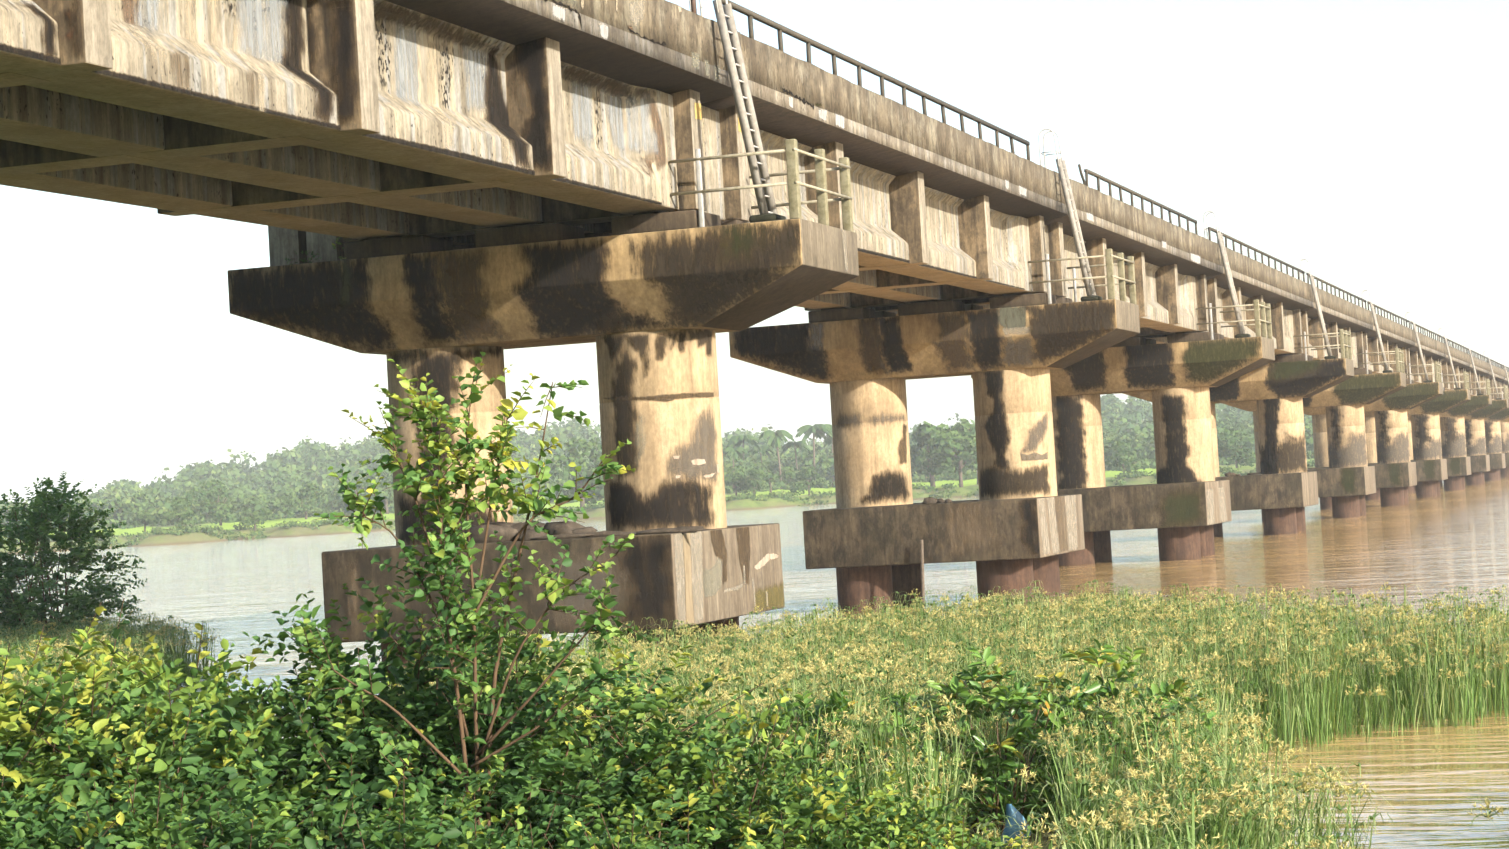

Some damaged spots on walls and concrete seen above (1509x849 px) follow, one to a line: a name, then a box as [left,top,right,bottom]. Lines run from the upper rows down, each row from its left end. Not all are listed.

damp [0,0,83,64]
damp [92,0,358,130]
damp [365,0,662,205]
damp [513,219,801,629]
damp [734,323,830,380]
damp [837,229,1227,557]